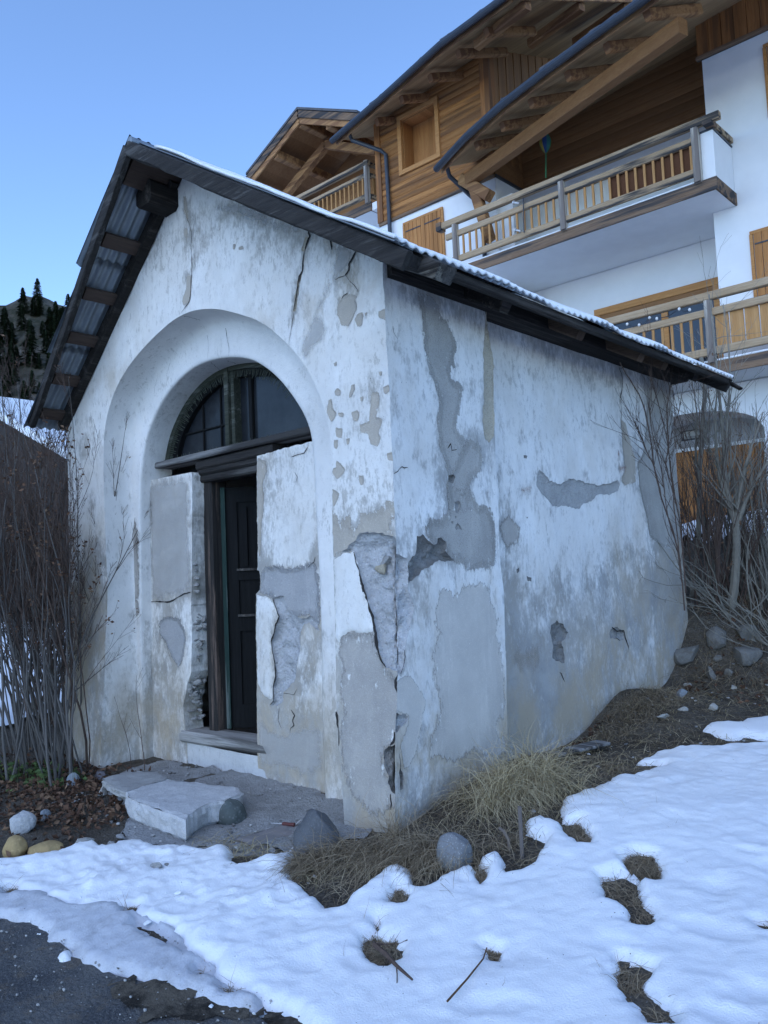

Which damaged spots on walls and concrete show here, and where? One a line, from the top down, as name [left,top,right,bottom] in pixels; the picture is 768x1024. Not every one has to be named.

crack [289,232,358,339]
peeling [159,617,186,667]
peeling [257,458,267,555]
peeling [260,562,320,706]
crack [353,552,406,692]
peeling [327,292,528,816]
spalling [550,621,568,663]
peeling [537,376,681,548]